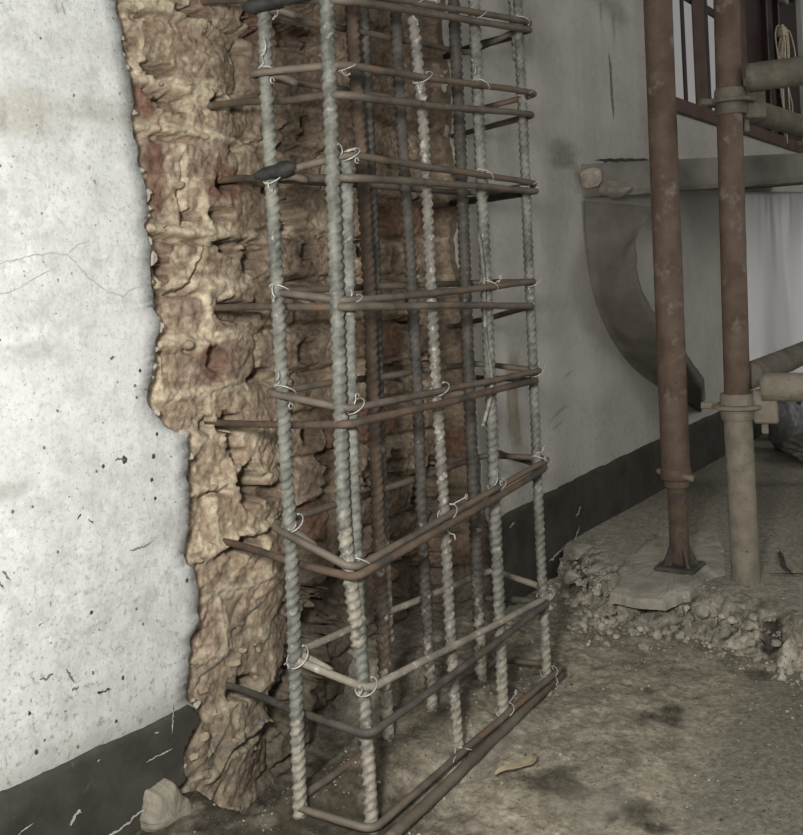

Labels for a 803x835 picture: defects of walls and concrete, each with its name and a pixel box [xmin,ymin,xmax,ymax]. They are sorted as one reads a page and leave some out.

spalling [270,4,326,174]
spalling [336,99,356,174]
spalling [369,0,395,95]
crack [0,241,148,303]
spalling [352,188,363,296]
spalling [373,0,473,609]
spalling [115,0,292,815]
spalling [278,183,353,758]
spalling [355,311,374,559]
spalling [363,573,377,645]
spalling [390,548,421,626]
spalling [481,523,494,609]